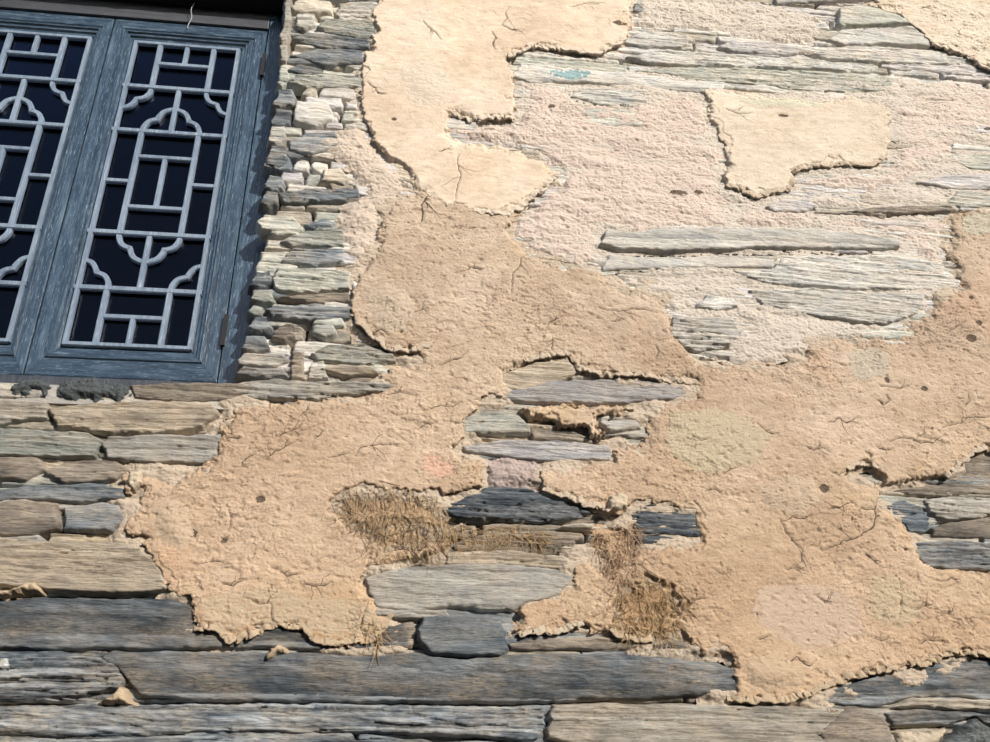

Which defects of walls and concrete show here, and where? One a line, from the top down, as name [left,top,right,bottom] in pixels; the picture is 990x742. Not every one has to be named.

spalling [508,0,828,63]
peeling [864,0,990,70]
spalling [307,15,414,304]
crack [421,147,472,222]
spalling [155,67,990,657]
spalling [103,462,210,560]
spalling [506,574,734,682]
spalling [696,641,990,709]